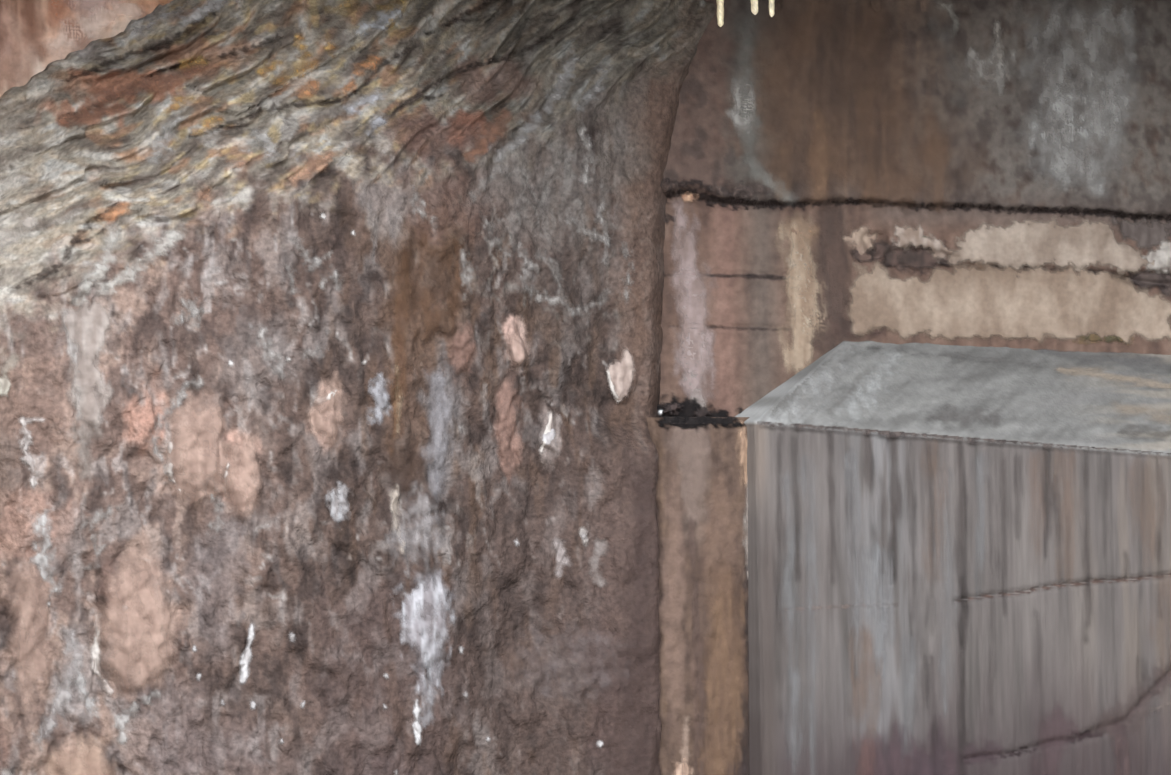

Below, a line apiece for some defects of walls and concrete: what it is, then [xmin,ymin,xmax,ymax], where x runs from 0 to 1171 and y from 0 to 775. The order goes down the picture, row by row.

leakage [58,0,238,44]
leakage [356,9,402,35]
efflorescence [968,23,1015,88]
efflorescence [732,18,790,198]
efflorescence [1027,3,1135,193]
crack [660,178,1171,223]
flaking render [843,217,1171,343]
crack [956,573,1171,601]
crack [962,670,1171,775]